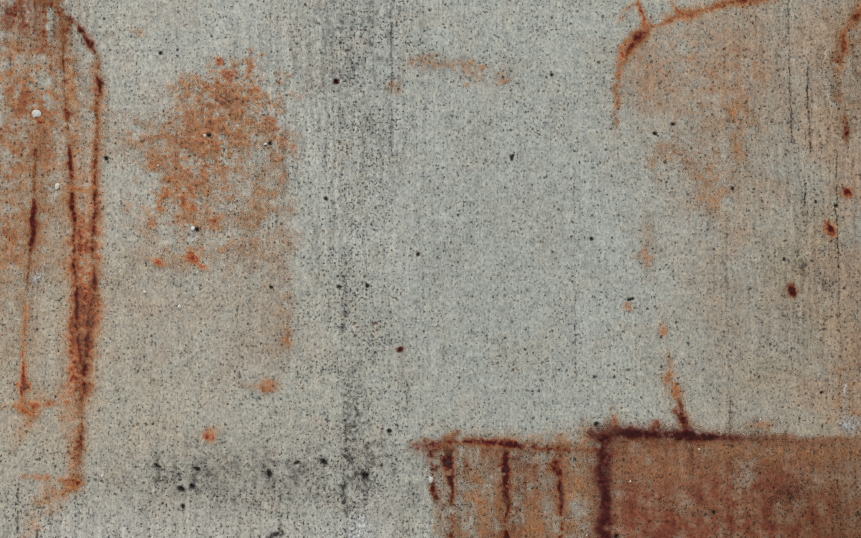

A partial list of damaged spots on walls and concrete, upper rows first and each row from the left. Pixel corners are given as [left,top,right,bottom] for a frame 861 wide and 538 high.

corrosion [613,0,764,109]
corrosion [835,6,861,71]
corrosion [128,57,296,231]
corrosion [0,0,104,504]
corrosion [185,247,206,269]
corrosion [787,282,797,298]
corrosion [824,221,836,238]
corrosion [412,370,861,538]